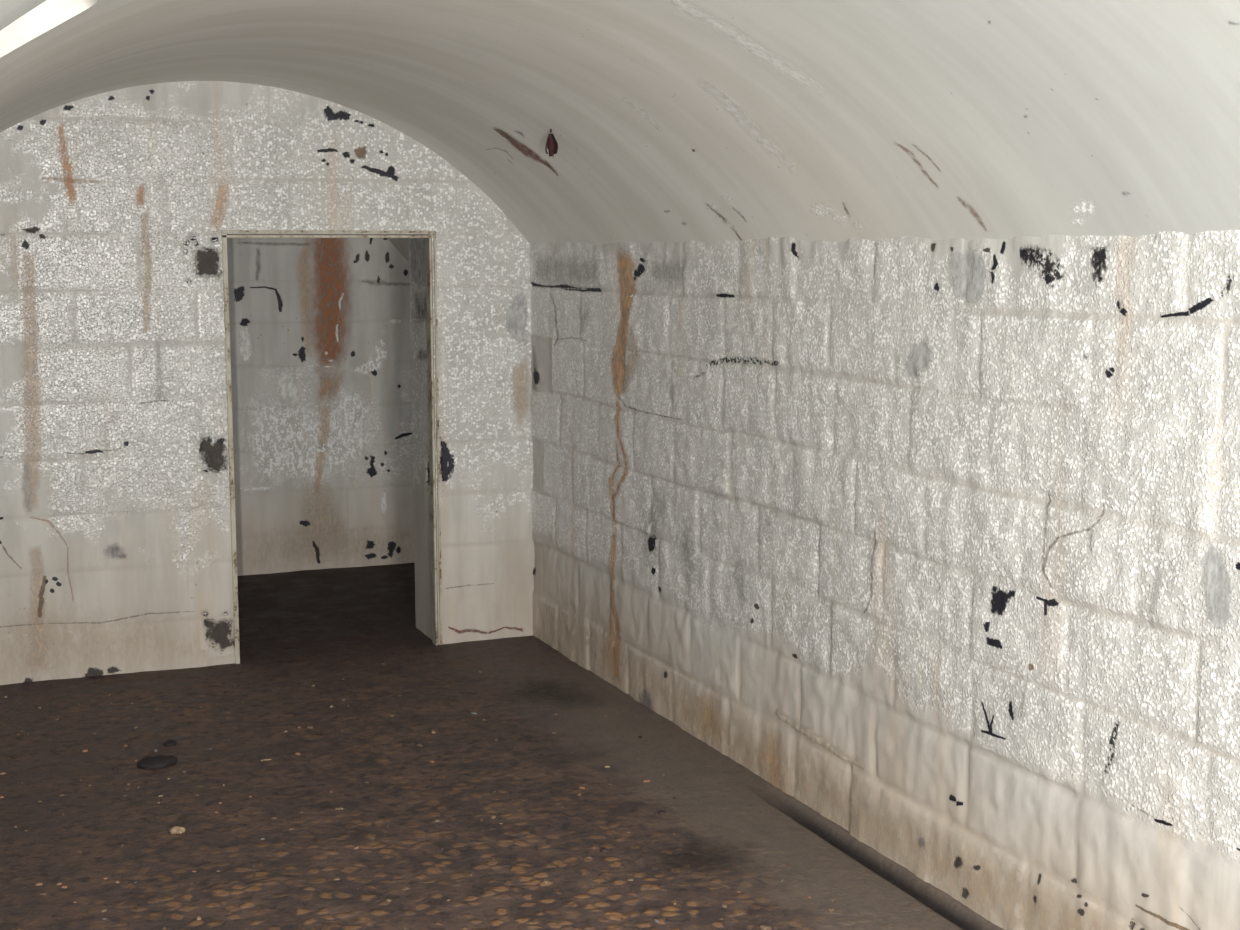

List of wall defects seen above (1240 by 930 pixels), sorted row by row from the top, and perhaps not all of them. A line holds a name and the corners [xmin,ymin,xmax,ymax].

corrosion [47,127,98,200]
corrosion [496,129,558,176]
peeling [184,236,222,283]
corrosion [316,238,347,363]
peeling [931,242,1063,302]
corrosion [609,255,636,518]
peeling [199,437,227,473]
peeling [203,612,235,651]
peeling [983,586,1016,649]